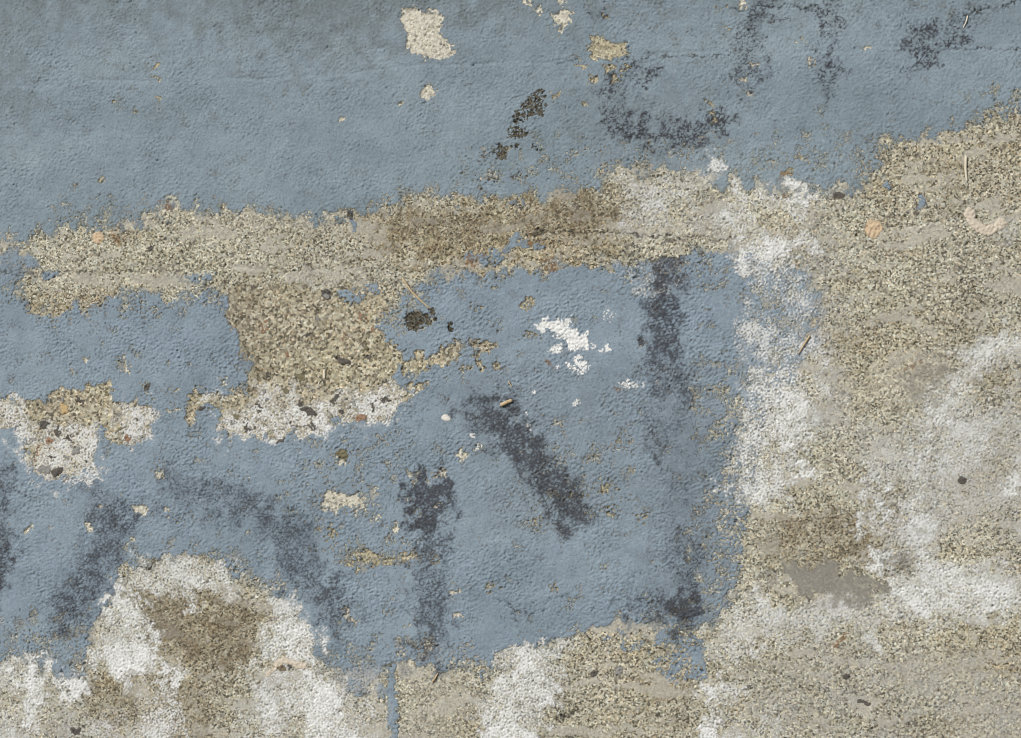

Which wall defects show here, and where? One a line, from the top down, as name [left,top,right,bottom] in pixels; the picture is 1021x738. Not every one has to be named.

peeling [399,3,456,61]
spalling [481,89,561,162]
peeling [166,276,502,443]
peeling [547,343,591,375]
leakage [599,107,848,512]
peeling [0,380,155,482]
leakage [0,392,160,497]
peeling [314,486,382,542]
leakage [470,396,588,538]
leakage [692,321,1021,738]
leakage [0,500,245,738]
leakage [237,557,383,738]